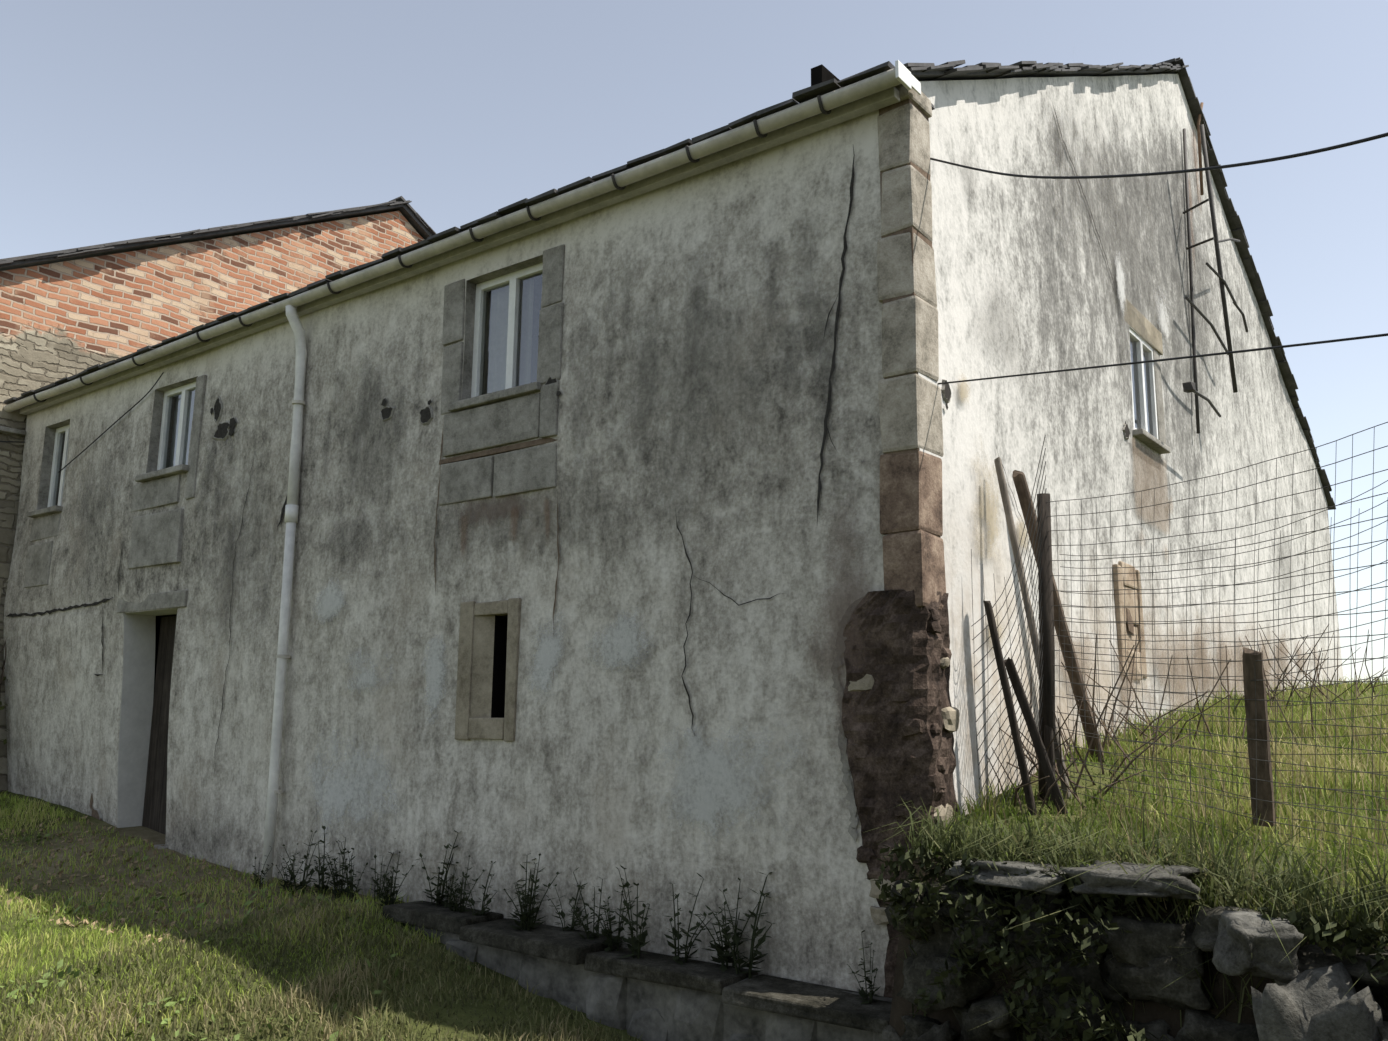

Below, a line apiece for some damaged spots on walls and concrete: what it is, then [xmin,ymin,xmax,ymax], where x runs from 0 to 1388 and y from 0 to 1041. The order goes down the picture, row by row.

crack [817,147,855,523]
crack [675,509,785,736]
flaking render [900,707,960,737]
flaking render [927,620,952,669]